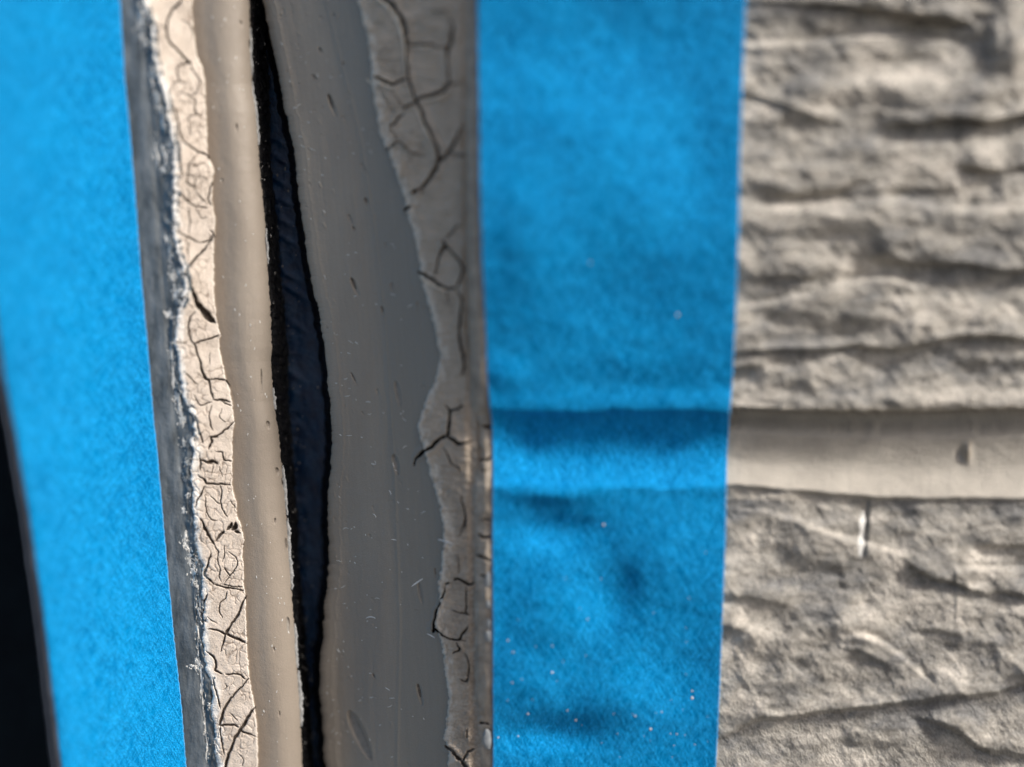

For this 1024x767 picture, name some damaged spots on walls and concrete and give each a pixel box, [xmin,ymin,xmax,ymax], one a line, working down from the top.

crack [143,0,258,767]
crack [358,0,492,767]